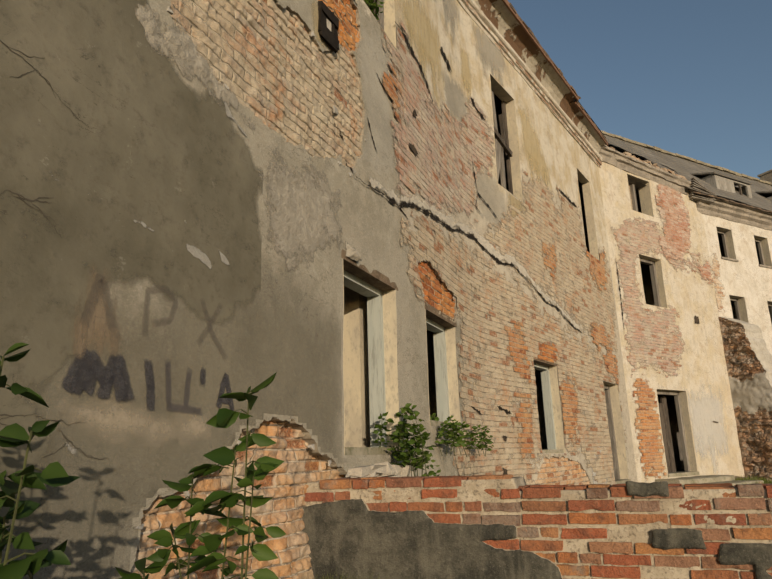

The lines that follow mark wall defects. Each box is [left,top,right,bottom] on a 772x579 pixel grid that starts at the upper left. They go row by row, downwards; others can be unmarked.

crack [0,40,86,125]
spalling [167,0,366,177]
crack [1,190,62,238]
water stain [0,0,337,577]
crack [346,156,584,334]
spalling [381,18,725,486]